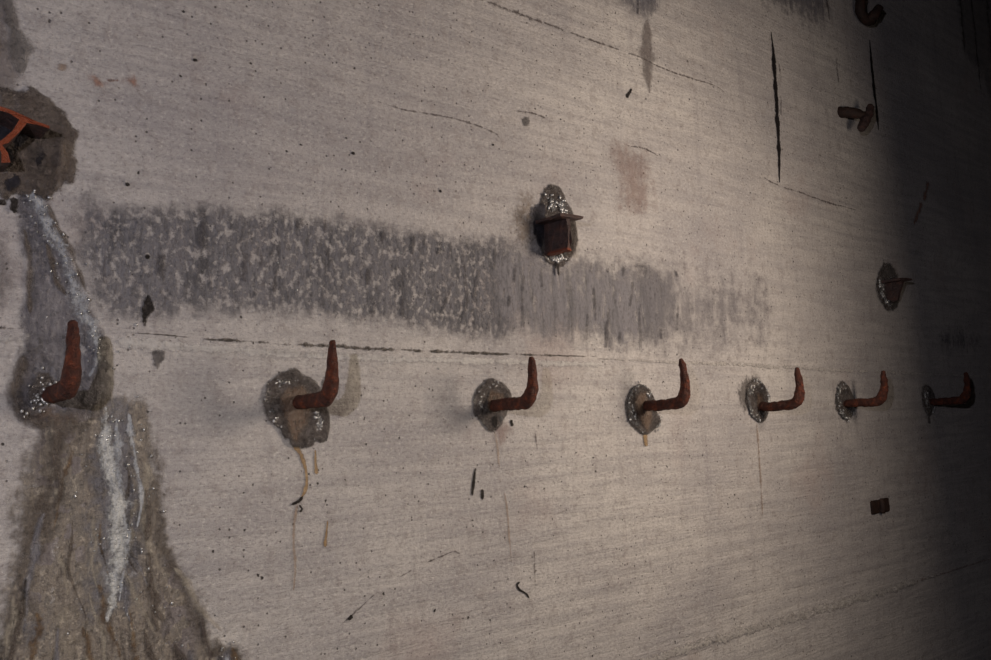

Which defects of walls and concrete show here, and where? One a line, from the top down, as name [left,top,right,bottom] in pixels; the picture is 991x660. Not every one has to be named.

leakage [0,0,33,88]
spalling [0,86,79,213]
crack [765,32,855,210]
crack [869,40,879,130]
spalling [533,184,578,275]
leakage [0,189,736,660]
corrosion [291,447,318,589]